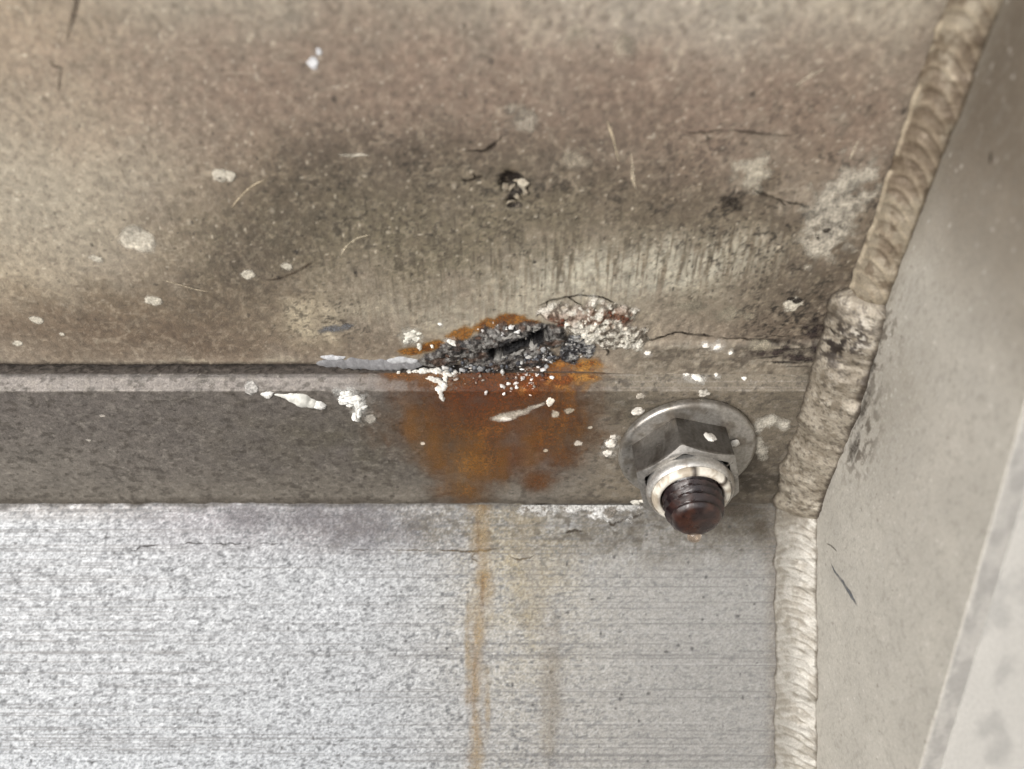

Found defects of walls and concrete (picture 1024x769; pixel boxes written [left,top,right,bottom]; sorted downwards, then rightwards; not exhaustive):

crack [537,294,612,316]
peeling [403,330,434,351]
rust [384,296,648,510]